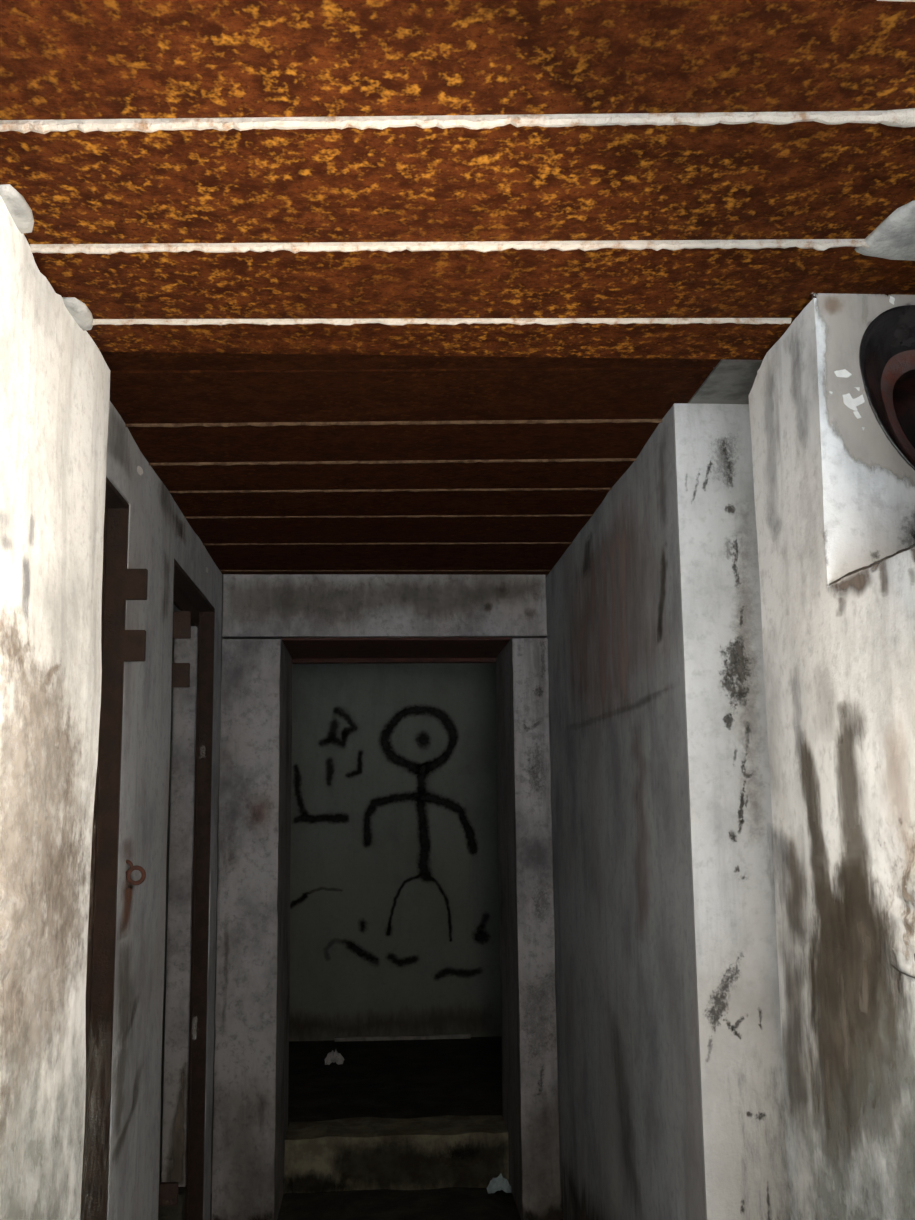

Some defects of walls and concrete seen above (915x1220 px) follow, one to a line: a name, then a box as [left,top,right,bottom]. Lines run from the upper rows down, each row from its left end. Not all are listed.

peeling [829,369,865,431]
water stain [732,540,740,586]
water stain [0,621,23,663]
water stain [719,606,750,730]
water stain [729,750,752,842]
water stain [706,953,744,1039]
water stain [786,707,915,1220]